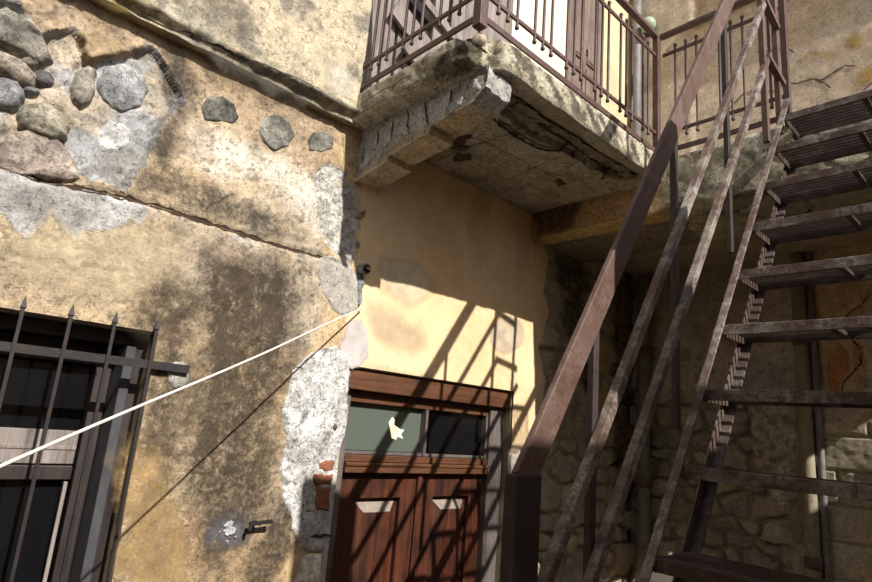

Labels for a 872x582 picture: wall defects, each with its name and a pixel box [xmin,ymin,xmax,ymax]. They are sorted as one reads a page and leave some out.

flaking render [0,0,187,242]
flaking render [258,113,295,153]
flaking render [305,129,335,154]
peeling [357,38,482,171]
crack [437,101,632,188]
crack [715,65,855,116]
crack [19,174,323,259]
flaking render [313,164,360,265]
leakage [22,225,301,569]
crack [841,339,862,391]
flaking render [313,460,335,511]
leakage [247,504,294,582]